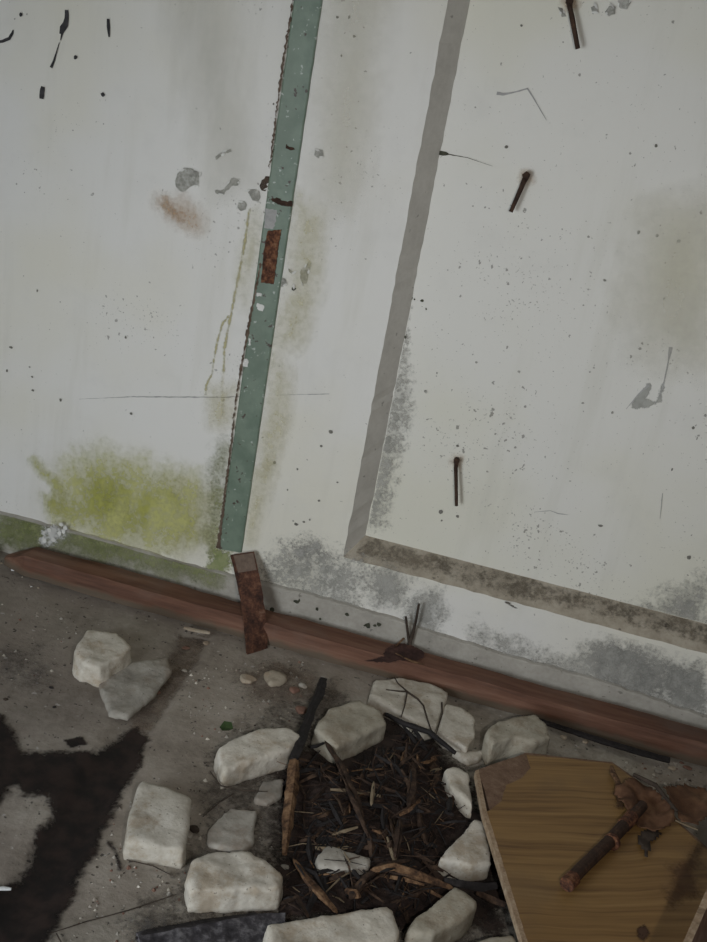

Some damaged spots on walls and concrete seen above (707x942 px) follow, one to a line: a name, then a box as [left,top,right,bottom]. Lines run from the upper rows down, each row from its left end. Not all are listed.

damp [260,538,451,631]
damp [480,571,586,608]
damp [603,586,707,642]
damp [471,627,706,715]